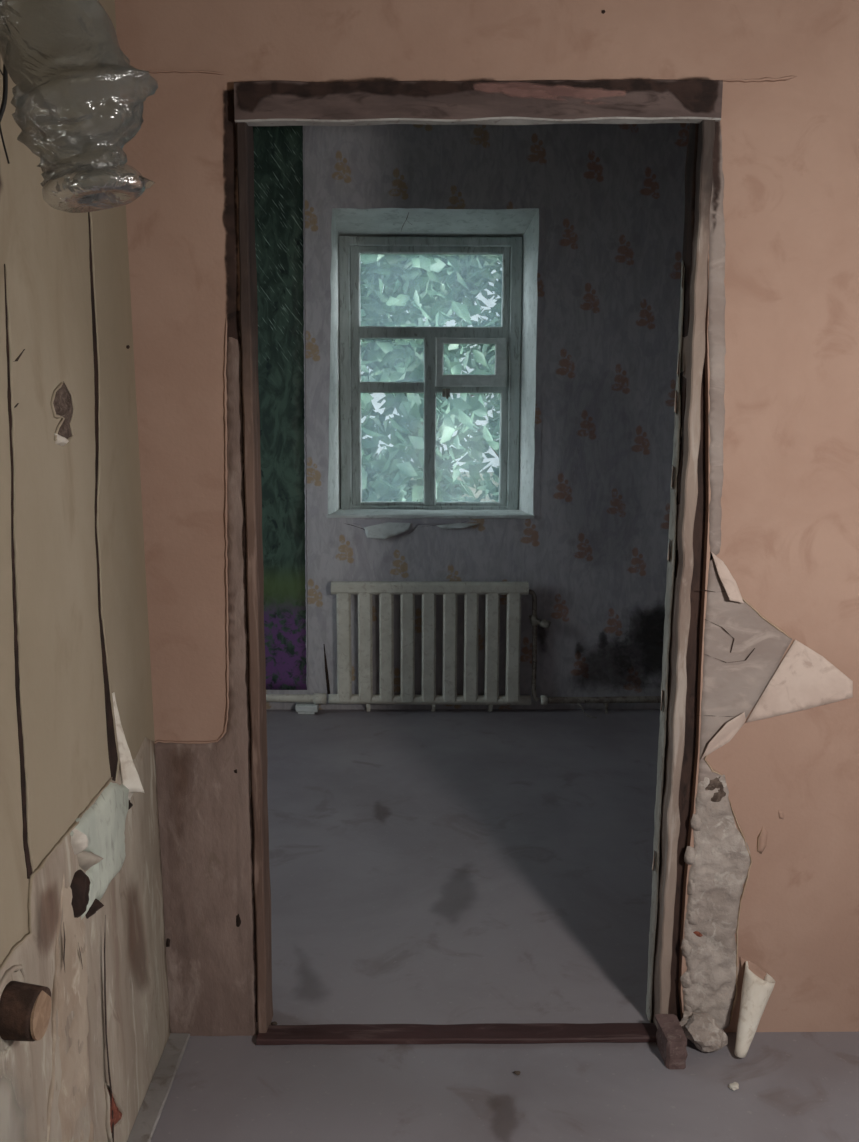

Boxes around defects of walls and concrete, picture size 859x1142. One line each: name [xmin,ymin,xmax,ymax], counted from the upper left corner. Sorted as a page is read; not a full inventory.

peeling [0,311,258,1142]
water stain [576,608,665,686]
peeling [680,127,853,1058]